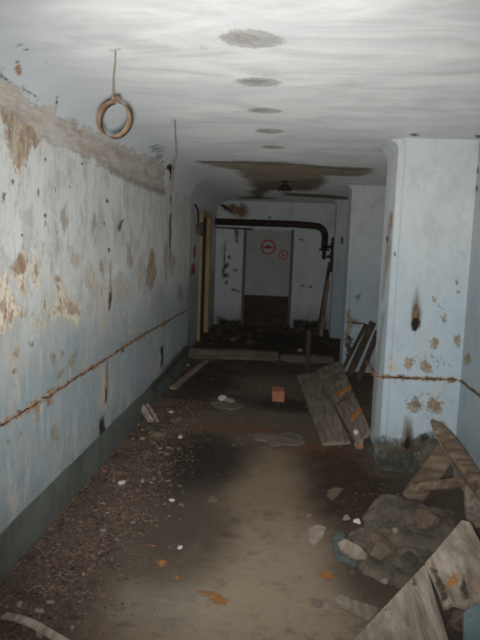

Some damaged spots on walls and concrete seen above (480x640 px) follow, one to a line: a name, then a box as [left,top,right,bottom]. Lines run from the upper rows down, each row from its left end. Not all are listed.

peeling [0,71,167,195]
peeling [0,237,98,336]
crack [0,309,188,427]
peeling [385,336,452,375]
crack [367,361,480,398]
peeling [404,393,448,429]
leakage [372,432,440,473]